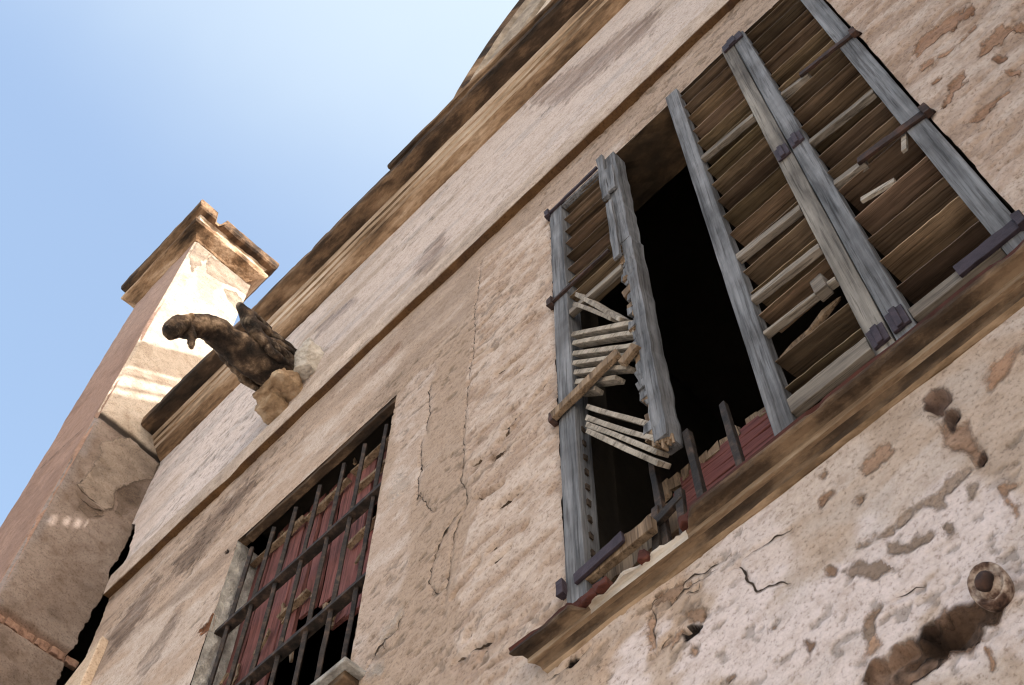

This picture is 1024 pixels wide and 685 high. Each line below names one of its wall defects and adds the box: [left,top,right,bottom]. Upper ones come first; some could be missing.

flaking render [912,4,978,72]
flaking render [978,22,1024,76]
flaking render [932,70,969,109]
flaking render [969,91,1010,123]
crack [417,263,482,598]
flaking render [818,471,835,508]
spalling [824,388,987,580]
spalling [647,581,707,656]
crack [652,528,793,650]